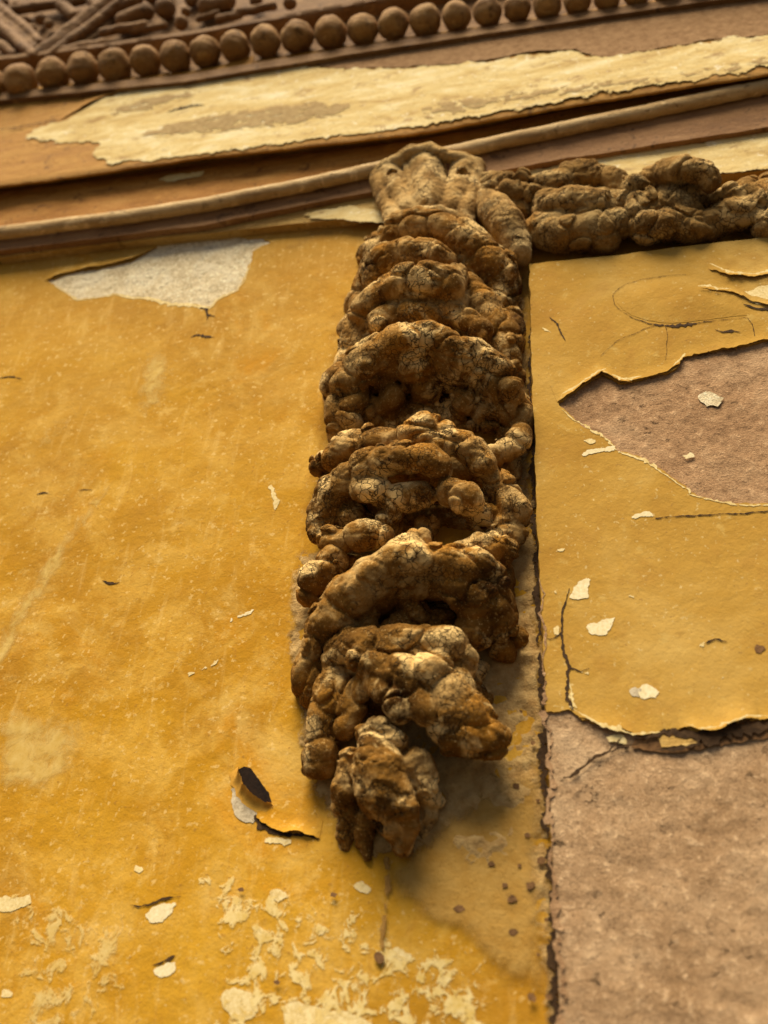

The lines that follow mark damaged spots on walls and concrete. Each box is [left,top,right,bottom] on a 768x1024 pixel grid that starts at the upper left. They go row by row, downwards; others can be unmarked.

peeling [26,0,768,165]
peeling [597,132,768,175]
peeling [45,238,270,309]
crack [609,274,755,354]
crack [527,318,565,403]
spalling [550,330,768,506]
crack [655,511,768,519]
crack [528,439,638,1024]
peeling [229,767,323,846]
spalling [527,578,768,1024]
peeling [133,896,180,923]
peeling [198,876,492,1024]